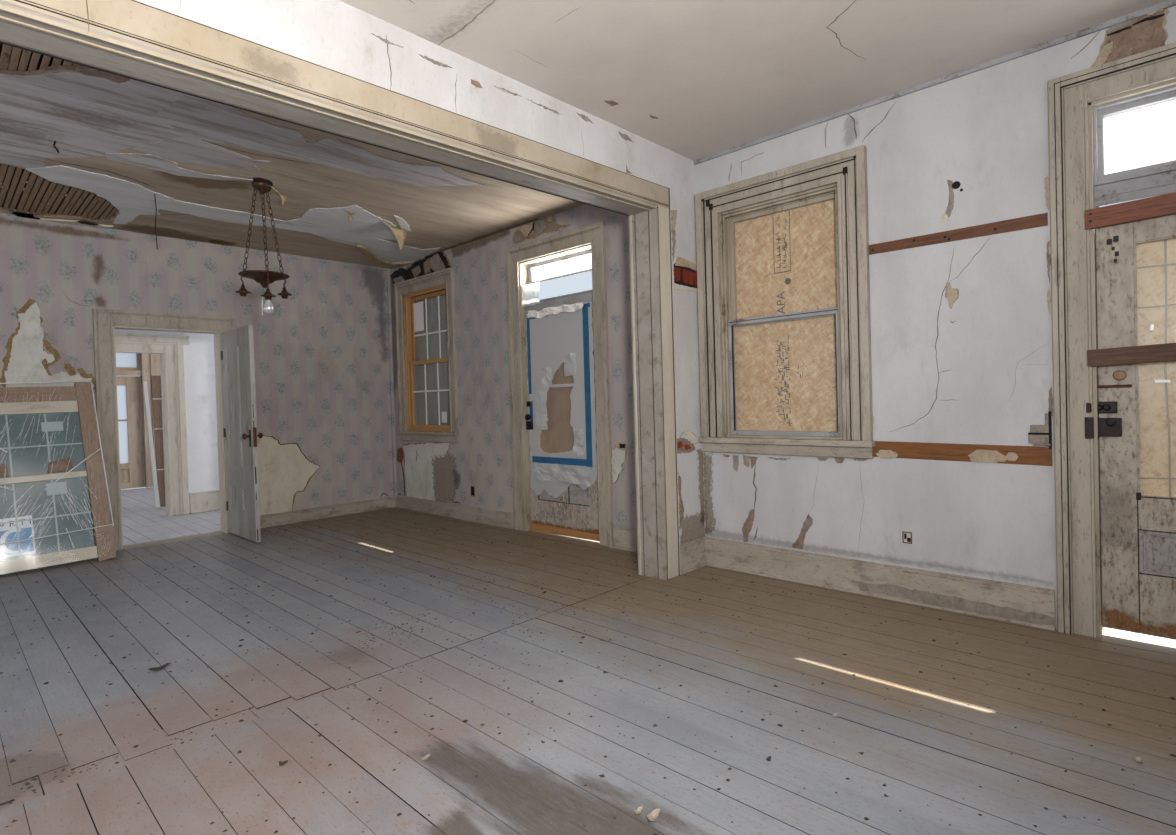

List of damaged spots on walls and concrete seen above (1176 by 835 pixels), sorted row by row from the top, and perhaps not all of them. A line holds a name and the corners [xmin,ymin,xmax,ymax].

crack [826,0,864,59]
spalling [1090,9,1169,68]
peeling [471,79,562,115]
peeling [0,43,484,287]
spalling [941,180,963,222]
crack [890,239,989,432]
peeling [723,454,791,472]
peeling [742,509,755,542]
peeling [792,514,813,550]